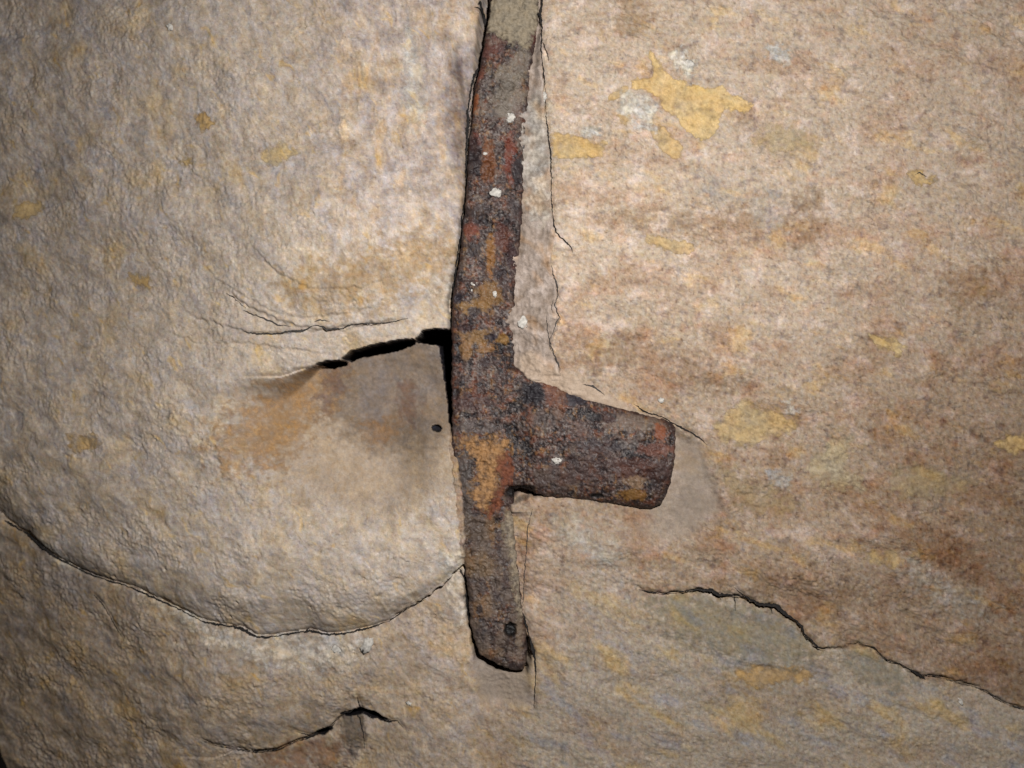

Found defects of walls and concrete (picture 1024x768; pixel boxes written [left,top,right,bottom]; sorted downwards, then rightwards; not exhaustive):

crack [227,293,407,334]
corrosion [453,433,515,519]
crack [5,520,427,639]
crack [640,587,823,649]
crack [866,645,1024,709]
crack [204,697,405,752]